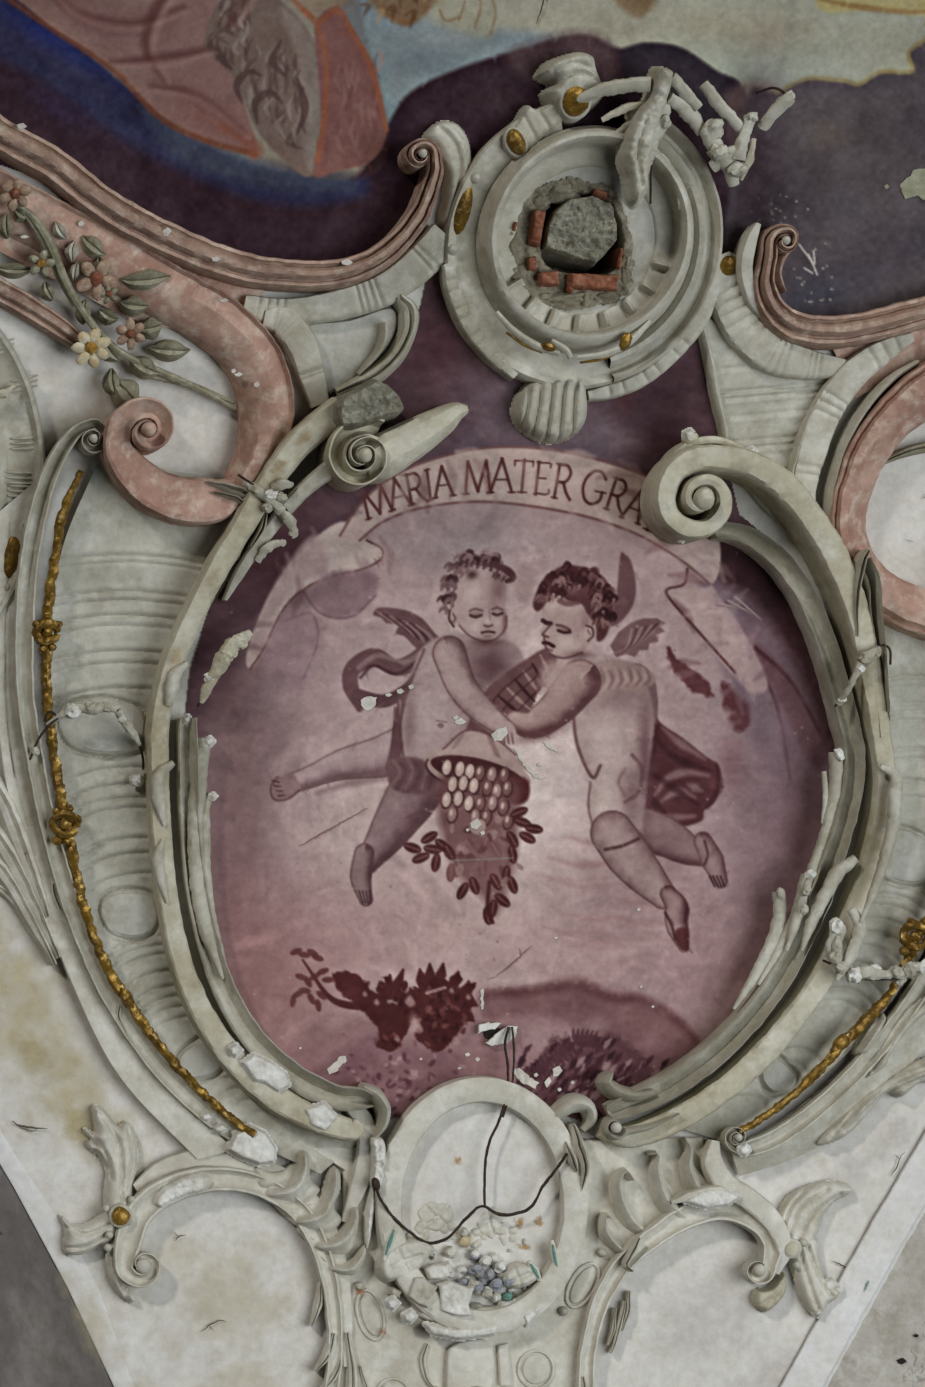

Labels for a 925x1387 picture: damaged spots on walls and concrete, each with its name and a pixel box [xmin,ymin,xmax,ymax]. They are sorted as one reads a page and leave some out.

peeling [884,168,925,200]
flaking render [509,176,635,311]
flaking render [457,988,518,1070]
flaking render [226,1042,292,1093]
peeling [327,1056,347,1075]
peeling [514,1066,575,1092]
flaking render [198,1110,278,1168]
flaking render [305,1100,339,1131]
flaking render [384,1227,541,1342]
flaking render [897,1322,925,1387]